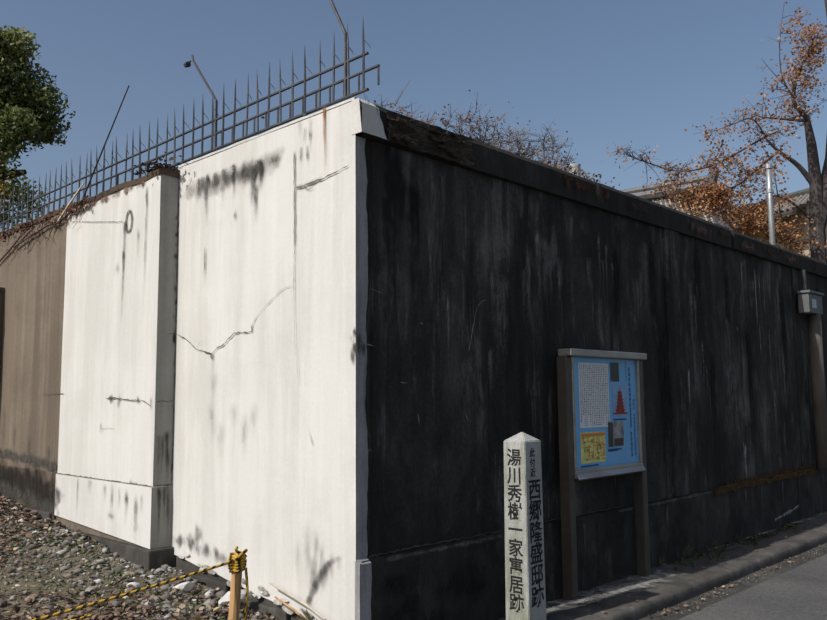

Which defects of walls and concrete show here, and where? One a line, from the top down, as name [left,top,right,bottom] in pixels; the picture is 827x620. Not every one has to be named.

water stain [197,155,277,205]
crack [293,155,348,261]
crack [177,282,294,358]
crack [106,396,169,405]
water stain [0,449,59,513]